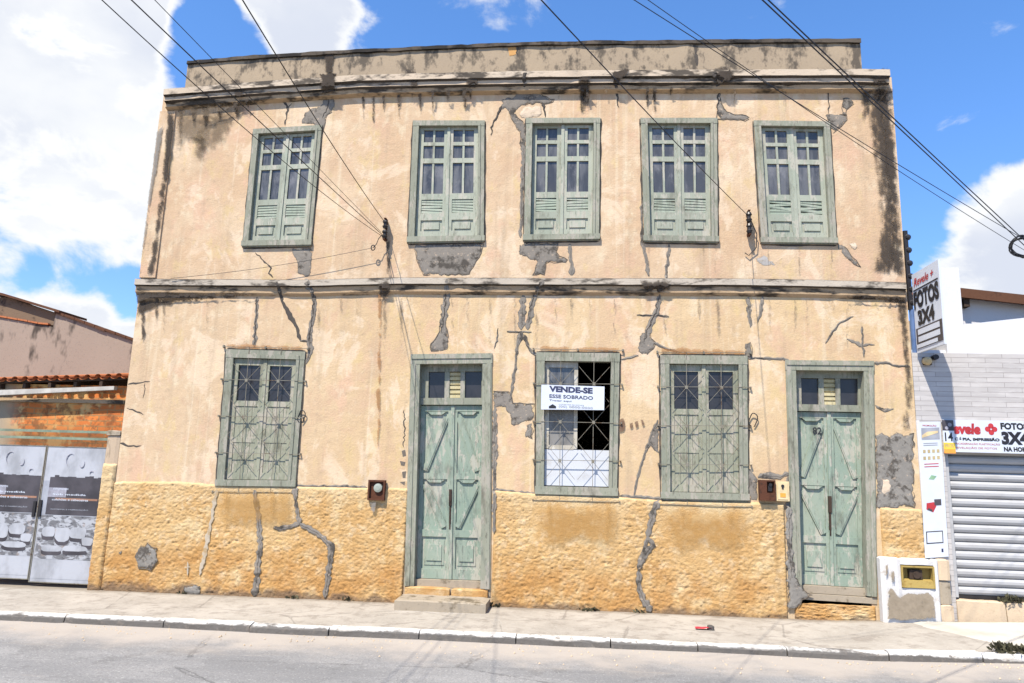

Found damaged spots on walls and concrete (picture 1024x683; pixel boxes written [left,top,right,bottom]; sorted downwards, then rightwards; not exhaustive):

damp [362,70,477,120]
damp [578,77,591,110]
flaking render [712,71,748,121]
damp [139,79,249,274]
damp [861,68,903,274]
flaking render [414,243,484,351]
flaking render [490,70,575,405]
crack [622,196,675,360]
crack [825,316,908,367]
crack [251,483,367,598]
crack [620,420,662,612]
flaking render [875,433,916,508]